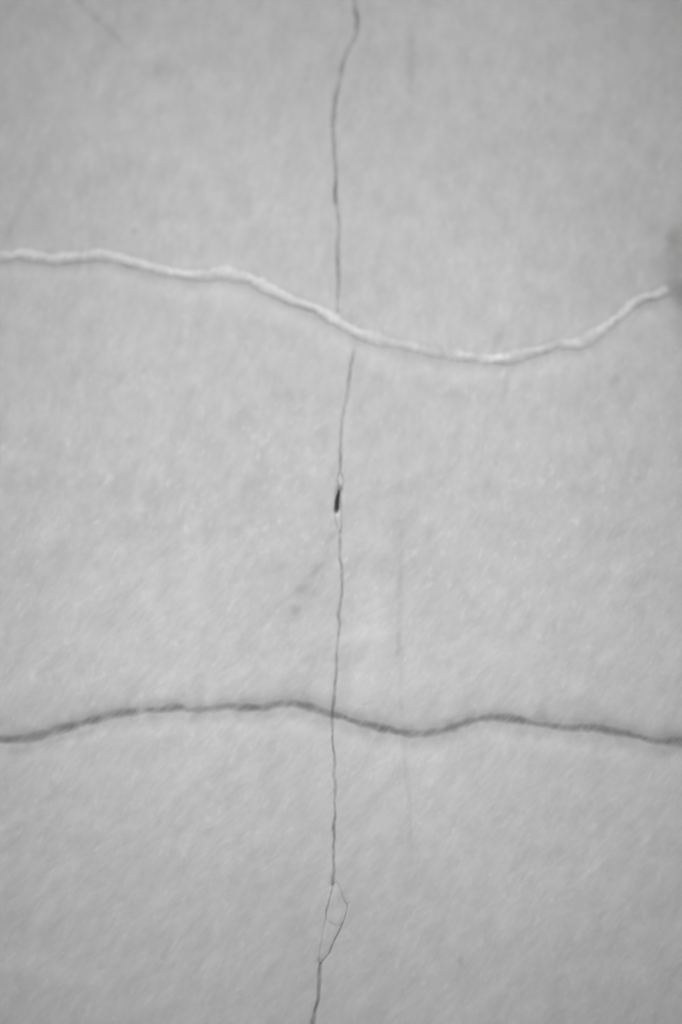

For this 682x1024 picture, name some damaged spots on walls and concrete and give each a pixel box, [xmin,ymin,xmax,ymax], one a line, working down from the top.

crack [329,901,343,924]